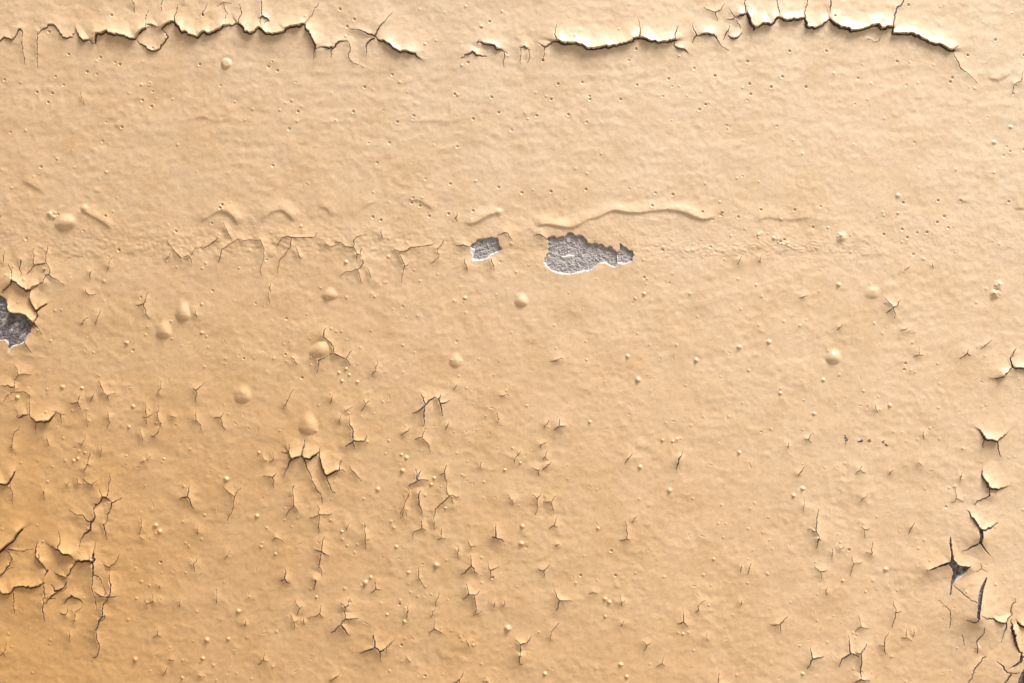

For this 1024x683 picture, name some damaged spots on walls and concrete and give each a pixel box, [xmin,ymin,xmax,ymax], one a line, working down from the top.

peeling [0,0,430,68]
peeling [456,0,978,84]
spalling [0,246,64,353]
crack [164,210,548,305]
spalling [471,237,503,262]
spalling [544,232,634,275]
crack [958,338,993,360]
crack [42,379,118,502]
crack [281,326,379,483]
crack [950,471,966,505]
crack [222,382,667,683]
crack [937,599,986,656]